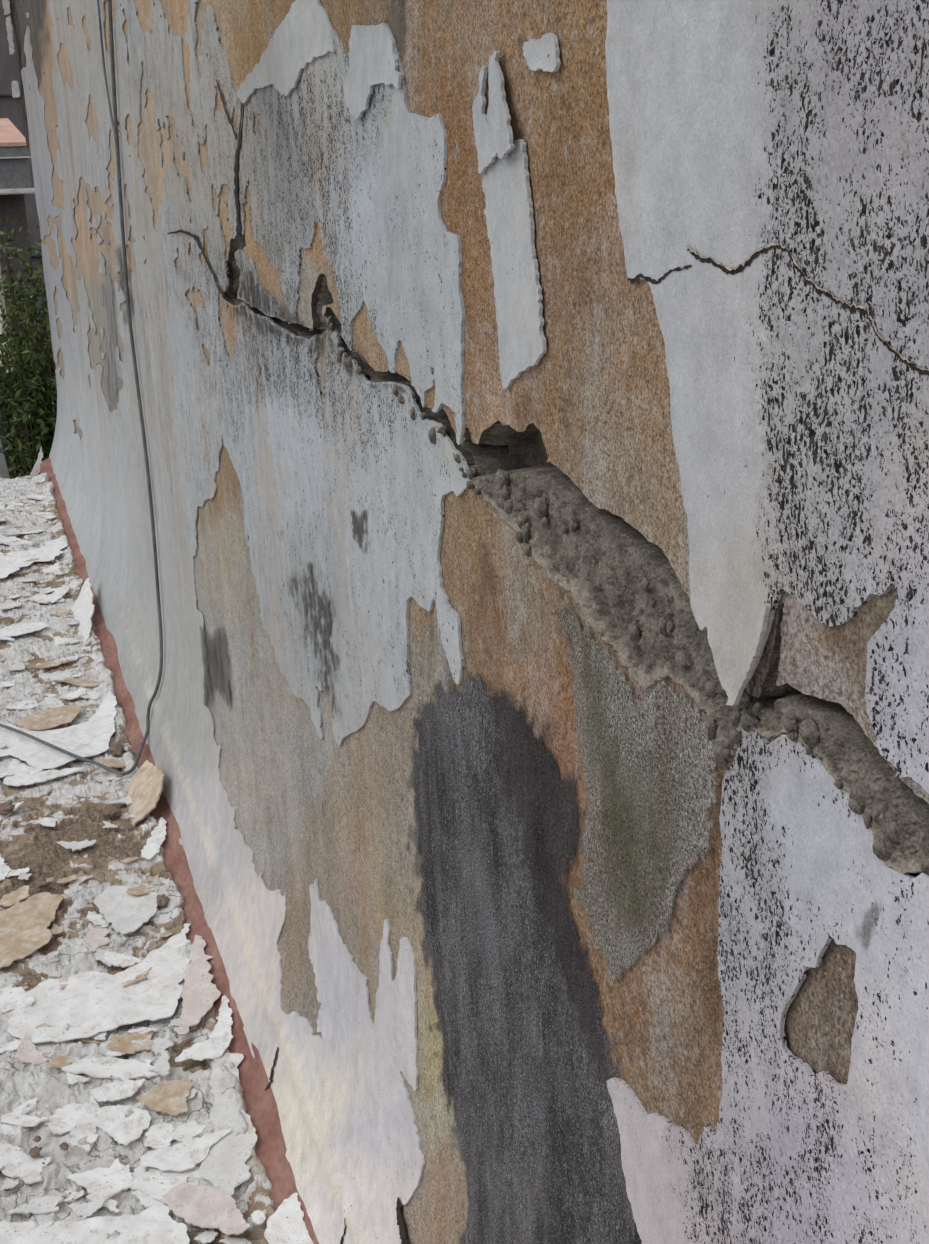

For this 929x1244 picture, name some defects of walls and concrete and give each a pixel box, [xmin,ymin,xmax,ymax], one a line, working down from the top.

peeling [2,0,691,597]
peeling [194,444,734,1244]
crack [167,79,929,876]
water stain [406,605,718,1244]
peeling [784,938,858,1084]
peeling [726,586,929,804]